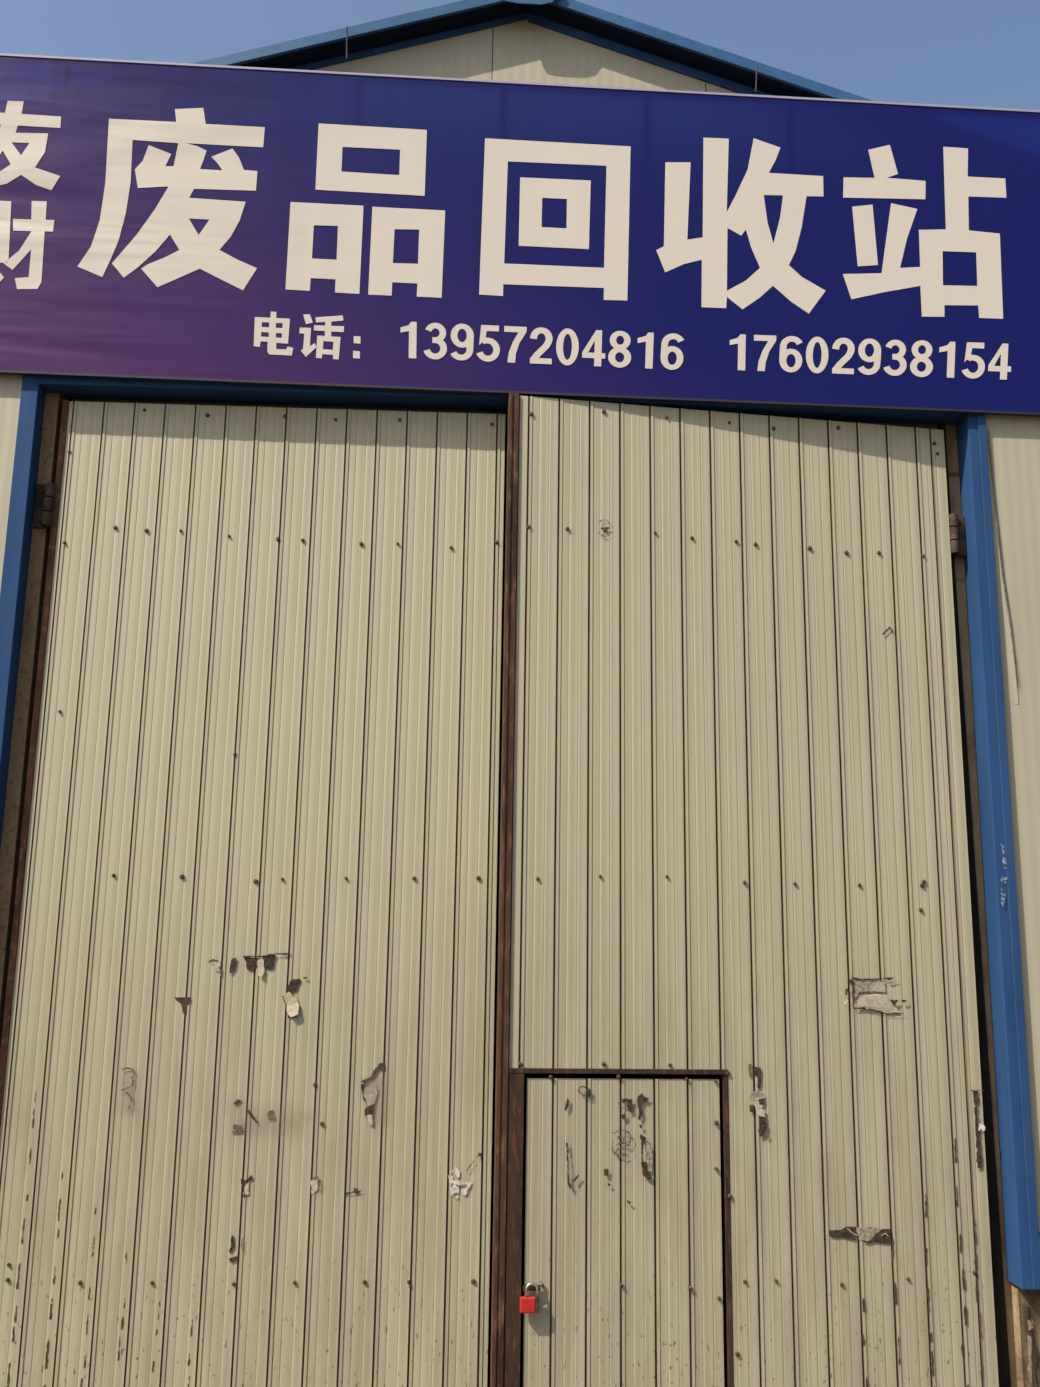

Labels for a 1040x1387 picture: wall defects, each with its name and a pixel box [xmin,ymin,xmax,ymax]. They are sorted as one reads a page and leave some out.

peeling [212,953,290,977]
peeling [284,977,307,1018]
peeling [844,977,907,1013]
peeling [829,1227,894,1260]